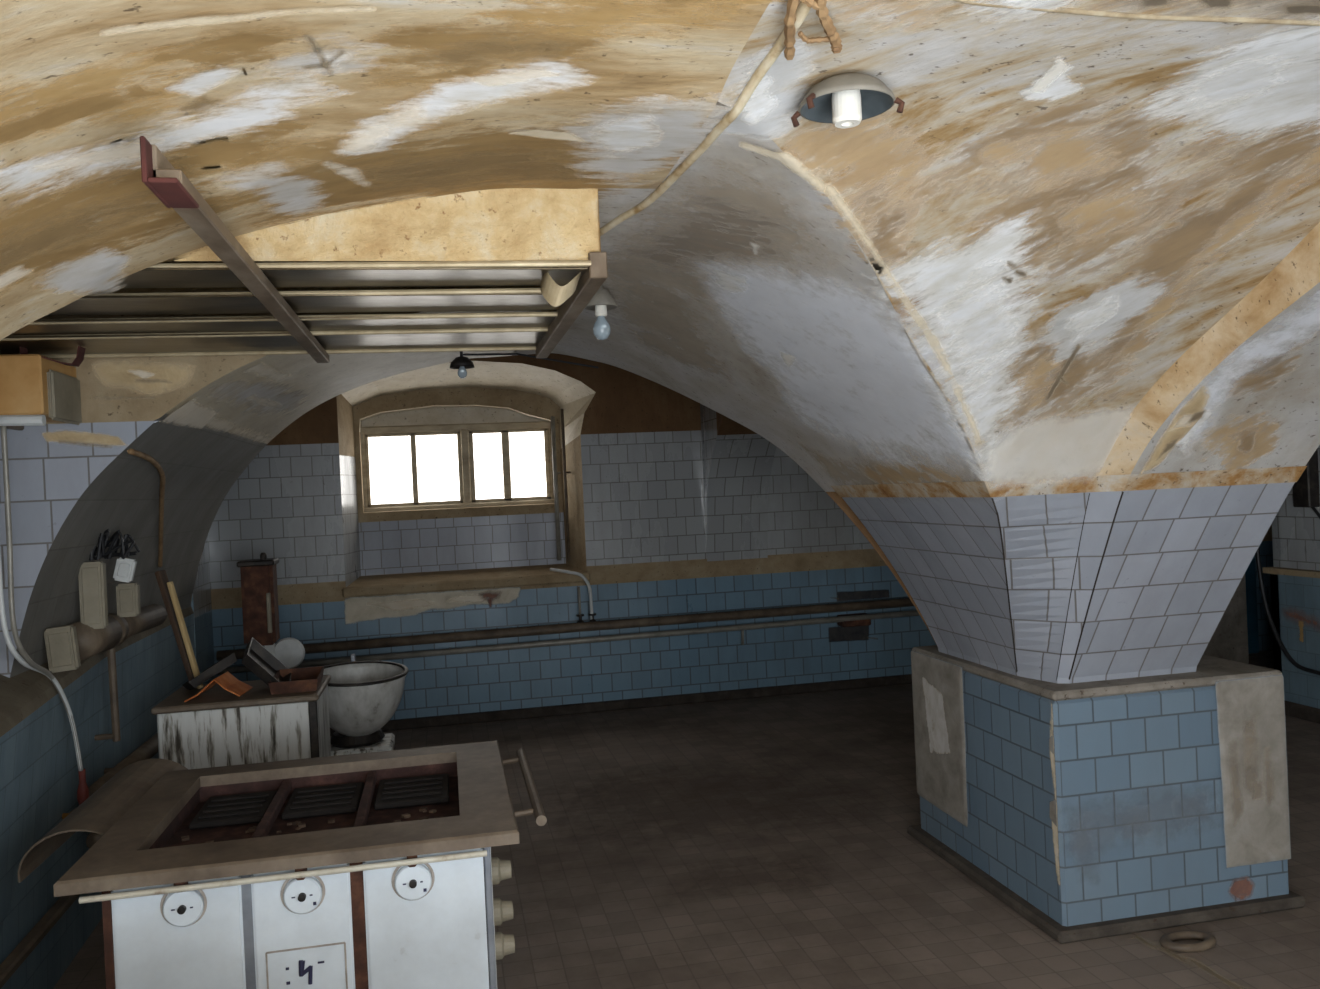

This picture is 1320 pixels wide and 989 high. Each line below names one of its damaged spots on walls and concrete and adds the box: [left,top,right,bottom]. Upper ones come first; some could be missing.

flaking render [1021,60,1080,99]
flaking render [1143,26,1320,138]
peeling [0,43,370,194]
peeling [226,164,326,214]
peeling [0,270,25,286]
peeling [44,250,128,293]
flaking render [703,218,1165,481]
flaking render [1145,299,1320,470]
peeling [344,588,520,624]
peeling [922,677,950,754]
rust [1230,877,1253,900]